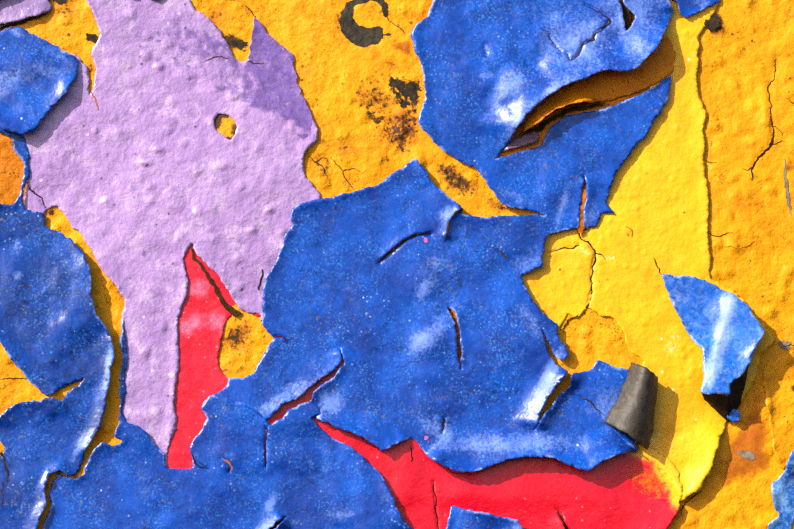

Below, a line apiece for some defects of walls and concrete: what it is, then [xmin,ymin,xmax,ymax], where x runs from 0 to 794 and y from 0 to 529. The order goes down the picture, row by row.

peeling [0,0,100,205]
damp [359,98,404,152]
damp [382,76,422,109]
crack [742,59,794,179]
peeling [0,343,84,415]
peeling [37,206,128,529]
peeling [218,304,273,378]
crack [552,233,606,330]
peeling [534,294,658,450]
peeling [763,350,794,470]